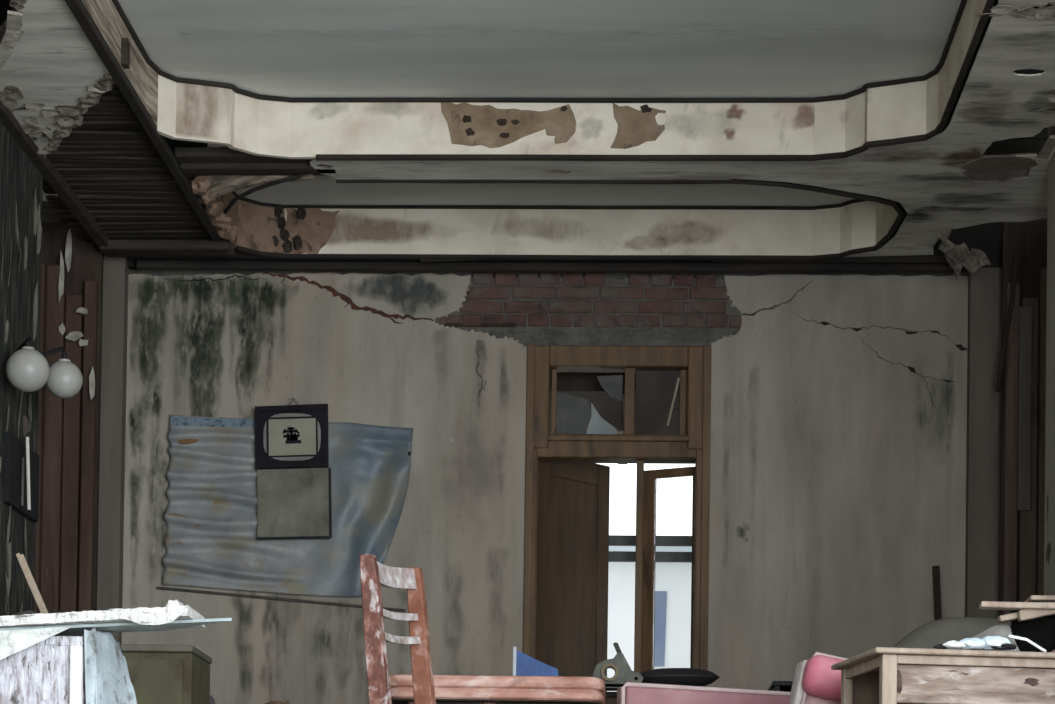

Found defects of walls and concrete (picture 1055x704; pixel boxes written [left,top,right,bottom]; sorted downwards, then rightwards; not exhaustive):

flaking render [121,38,130,69]
peeling [441,102,576,148]
peeling [610,103,666,149]
flaking render [0,78,340,301]
peeling [58,323,88,346]
leakage [140,278,285,417]
crack [161,272,434,324]
spalling [433,272,742,347]
crack [741,280,967,416]
peeling [6,506,27,616]